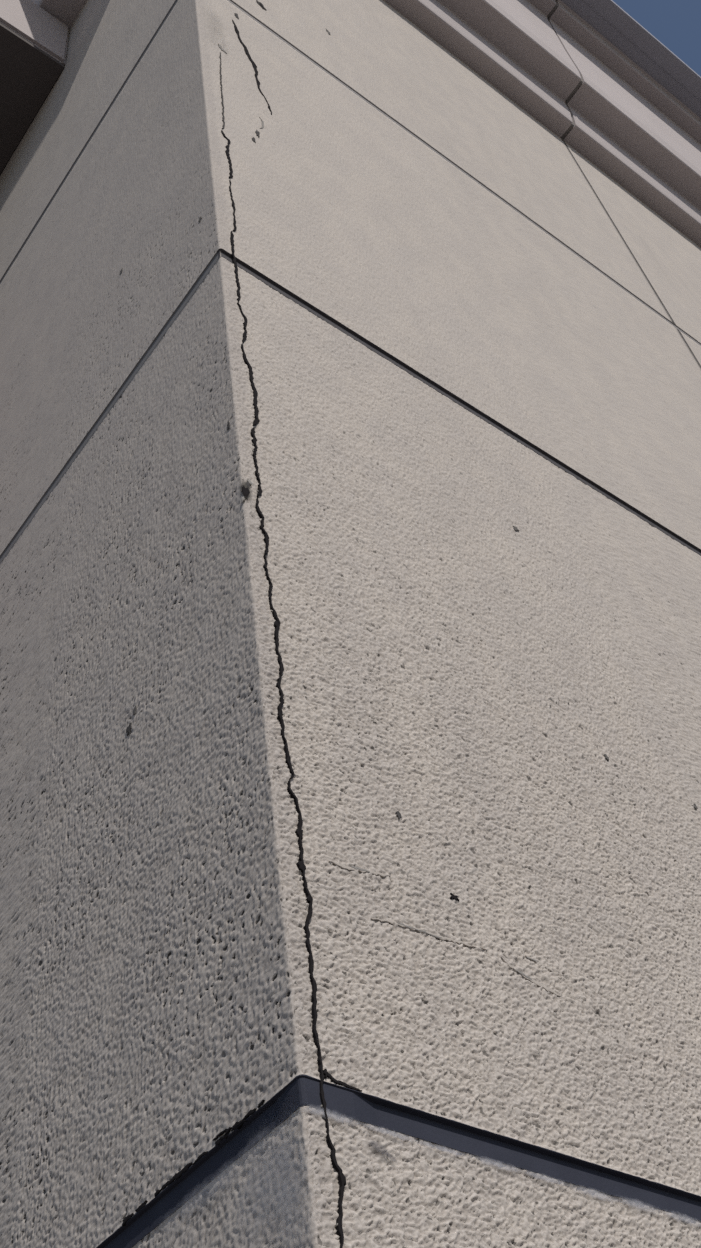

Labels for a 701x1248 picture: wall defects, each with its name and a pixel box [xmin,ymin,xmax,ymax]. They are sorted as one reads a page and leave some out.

crack [218,13,346,1248]